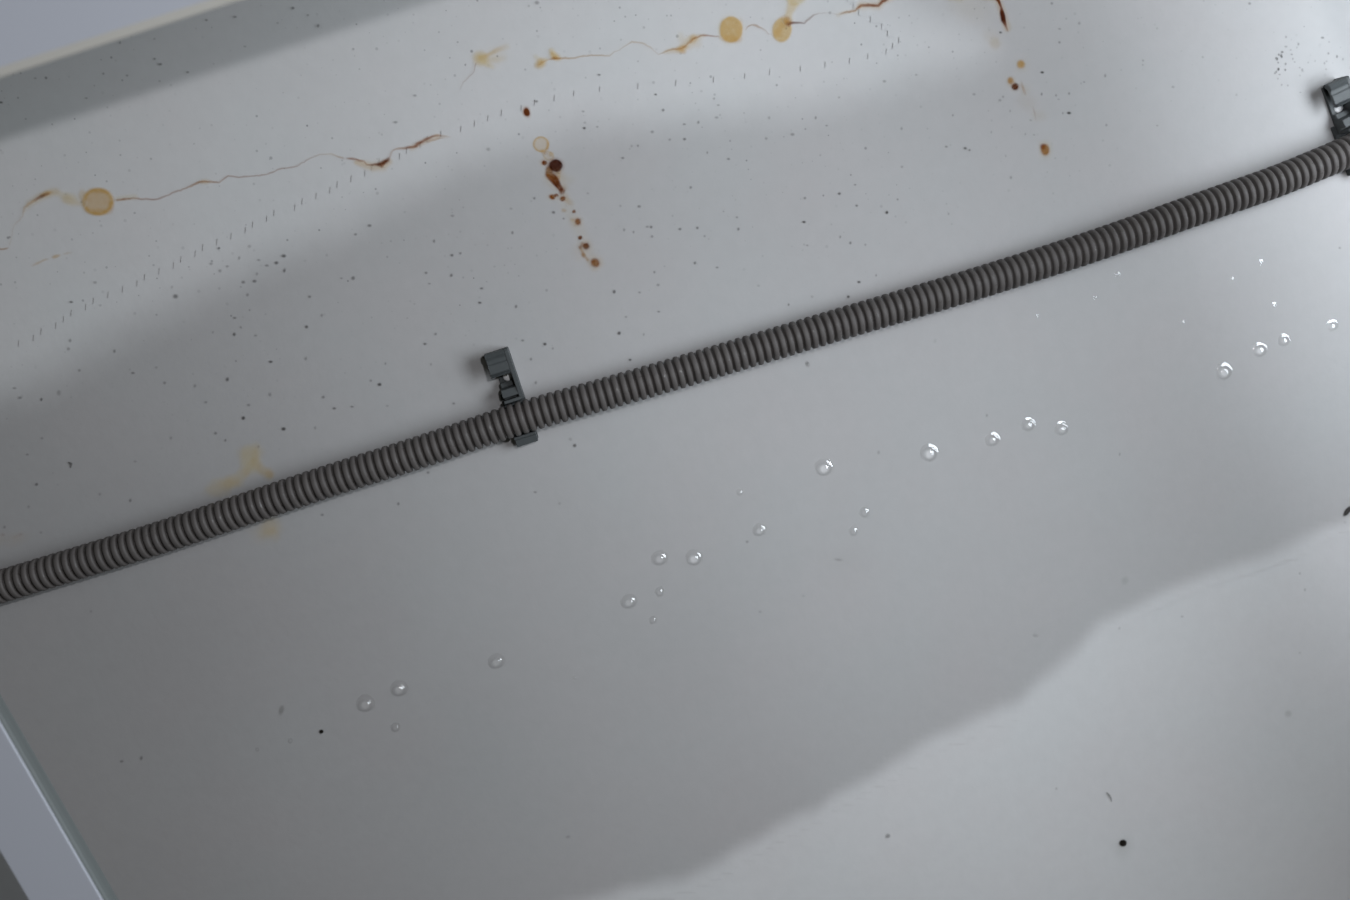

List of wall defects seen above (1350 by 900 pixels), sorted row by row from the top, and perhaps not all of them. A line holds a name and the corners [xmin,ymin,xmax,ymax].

corrosion [543,160,595,263]
water stain [0,0,1350,569]
water stain [0,851,29,900]